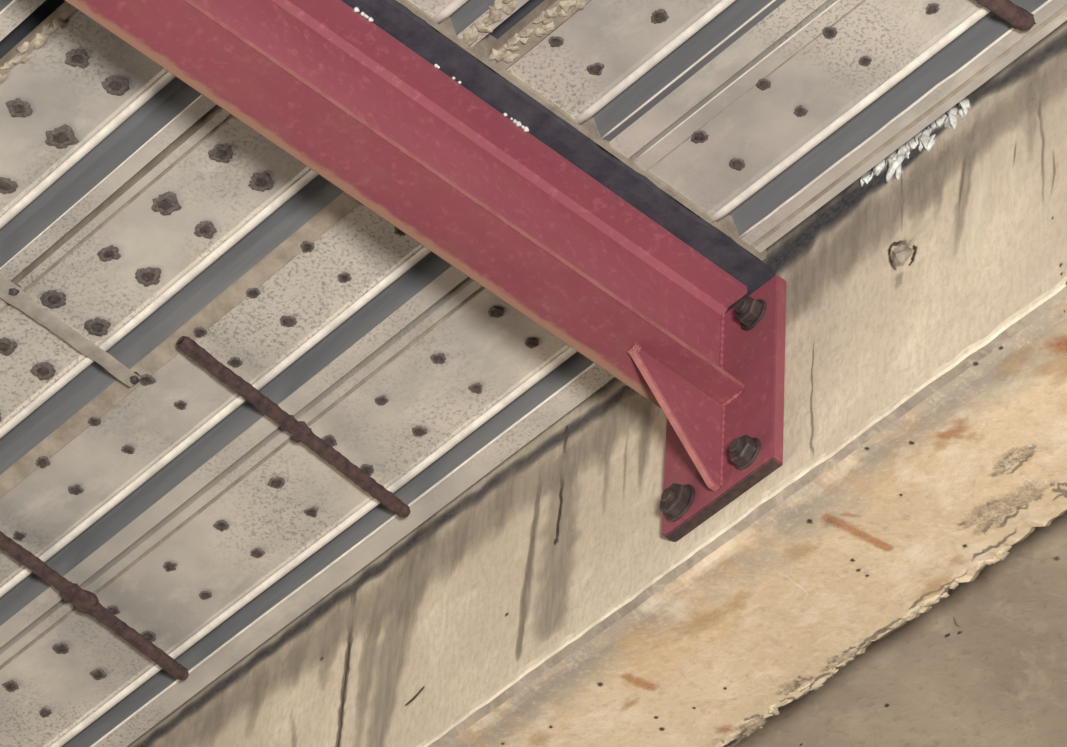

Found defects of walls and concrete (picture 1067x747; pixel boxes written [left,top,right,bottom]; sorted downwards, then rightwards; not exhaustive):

rust [975,0,1036,31]
water stain [763,33,1067,312]
rust [0,531,189,680]
rust [177,336,411,518]
water stain [137,386,650,747]
crack [808,351,816,451]
rust [823,514,892,550]
spalling [715,546,1012,747]
spalling [990,446,1035,476]
spalling [961,483,1067,533]